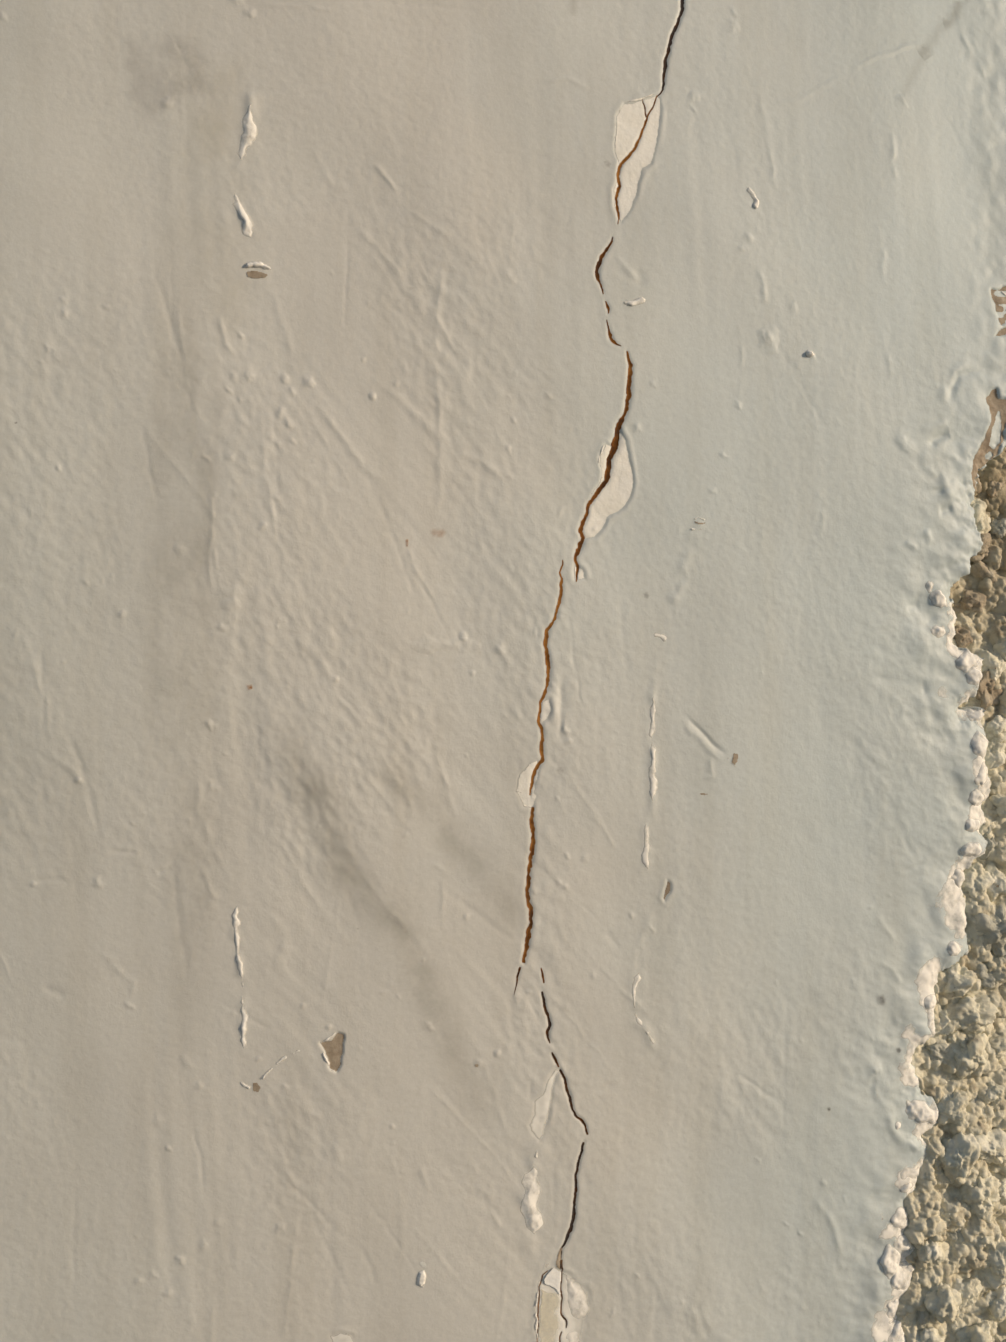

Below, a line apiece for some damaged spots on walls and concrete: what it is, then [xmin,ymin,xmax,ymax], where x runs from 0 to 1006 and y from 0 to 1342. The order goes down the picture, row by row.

peeling [614,94,660,221]
peeling [991,286,1006,336]
peeling [583,433,633,538]
crack [514,0,684,1342]
spalling [872,389,1006,1342]
peeling [321,1033,344,1071]
peeling [534,1268,589,1342]